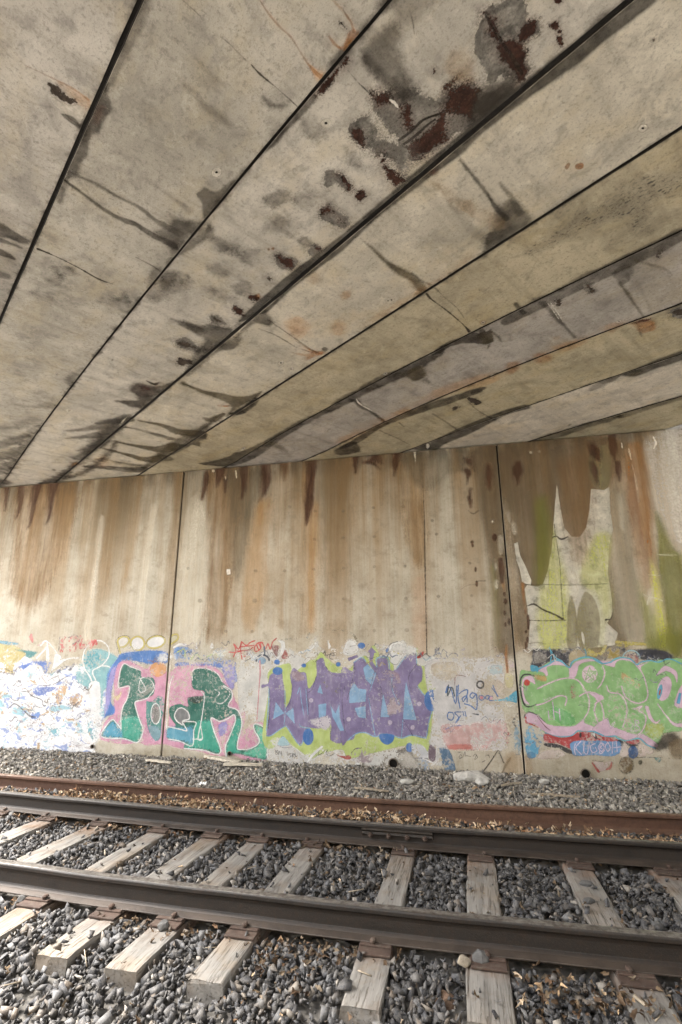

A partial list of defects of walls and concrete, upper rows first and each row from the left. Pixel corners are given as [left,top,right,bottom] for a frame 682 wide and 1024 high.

leakage [185,0,655,367]
leakage [90,199,151,235]
leakage [167,180,235,251]
leakage [591,236,682,280]
rust [4,483,58,527]
leakage [0,381,259,538]
rust [201,468,226,499]
rust [261,464,271,495]
rust [305,460,316,524]
rust [352,453,400,473]
leakage [473,415,627,657]